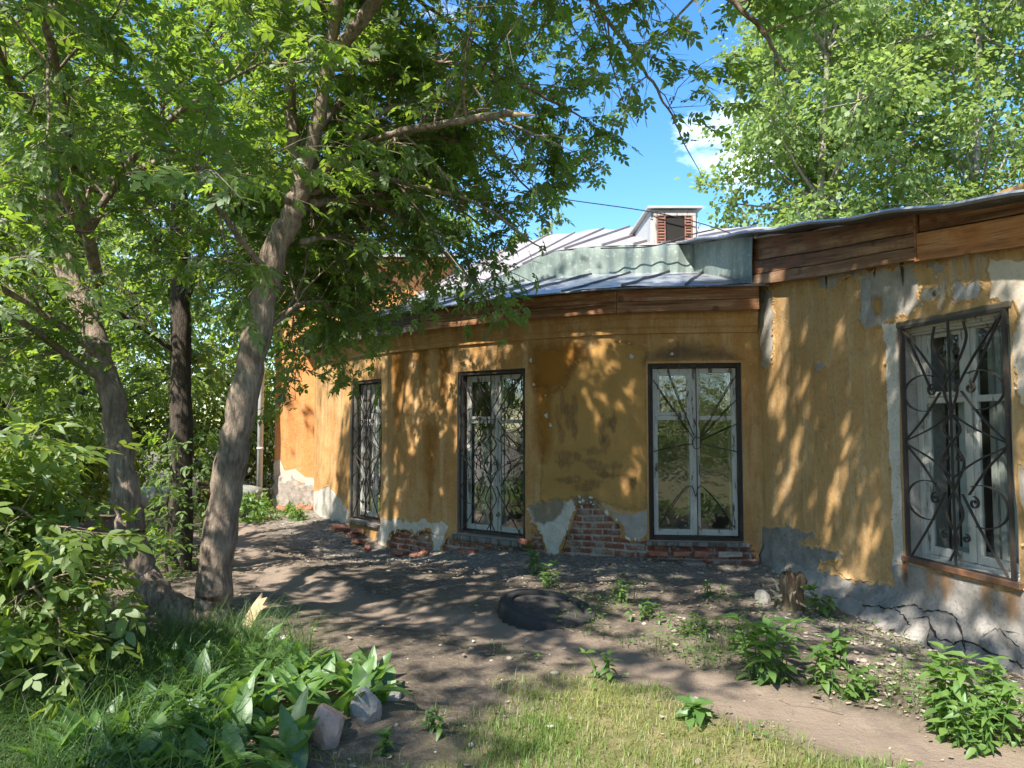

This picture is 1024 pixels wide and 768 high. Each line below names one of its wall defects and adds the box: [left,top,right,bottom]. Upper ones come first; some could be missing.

spalling [272,459,349,525]
peeling [376,255,1024,676]
crack [823,563,1024,668]